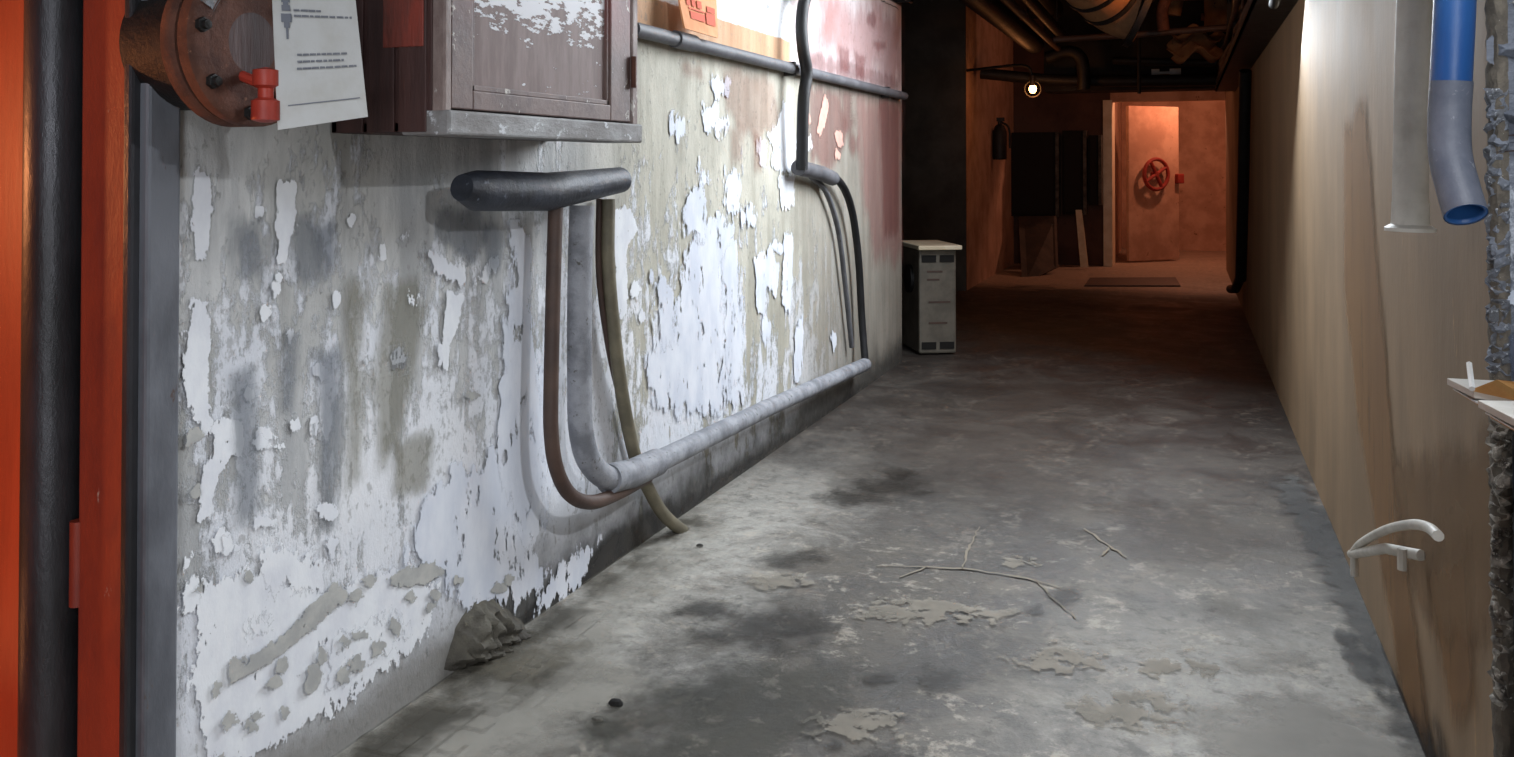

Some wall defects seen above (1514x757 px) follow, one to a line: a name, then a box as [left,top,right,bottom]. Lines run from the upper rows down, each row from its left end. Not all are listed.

peeling [190,166,216,261]
peeling [255,179,298,323]
spalling [1483,88,1514,376]
peeling [177,219,603,757]
leakage [354,384,868,757]